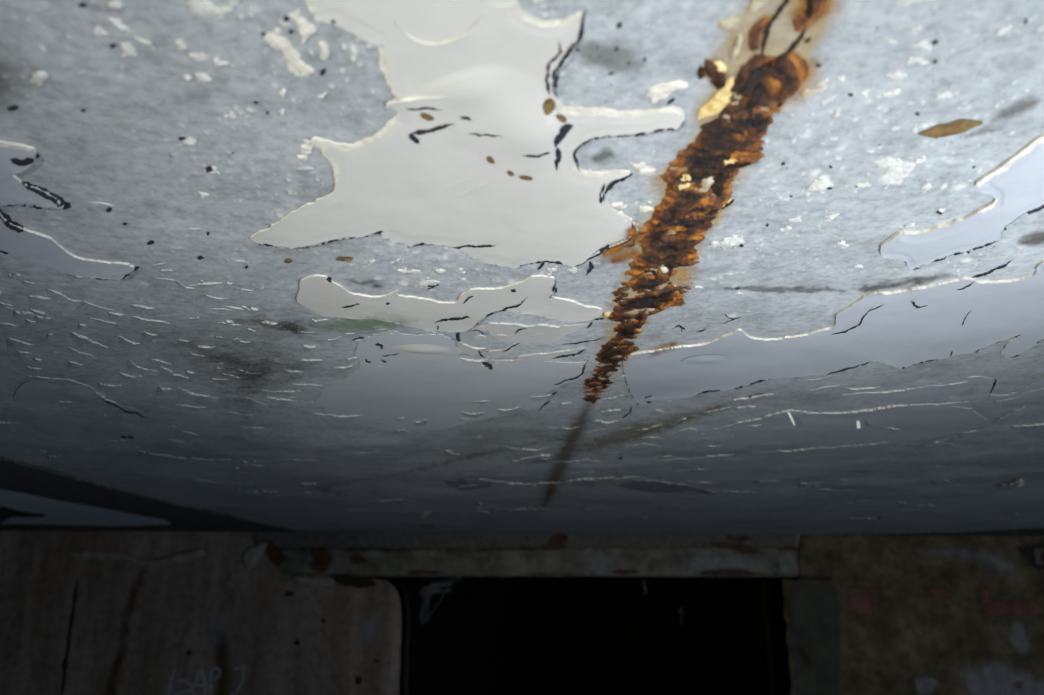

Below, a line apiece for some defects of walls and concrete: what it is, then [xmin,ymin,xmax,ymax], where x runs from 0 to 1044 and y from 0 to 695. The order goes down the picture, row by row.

peeling [93,18,152,58]
peeling [174,38,235,84]
peeling [186,0,239,21]
peeling [816,64,868,118]
peeling [883,24,938,97]
spalling [919,120,983,139]
peeling [0,140,135,280]
peeling [250,0,685,430]
corrosion [547,0,828,501]
peeling [0,273,170,341]
peeling [149,262,278,384]
peeling [560,134,1044,491]